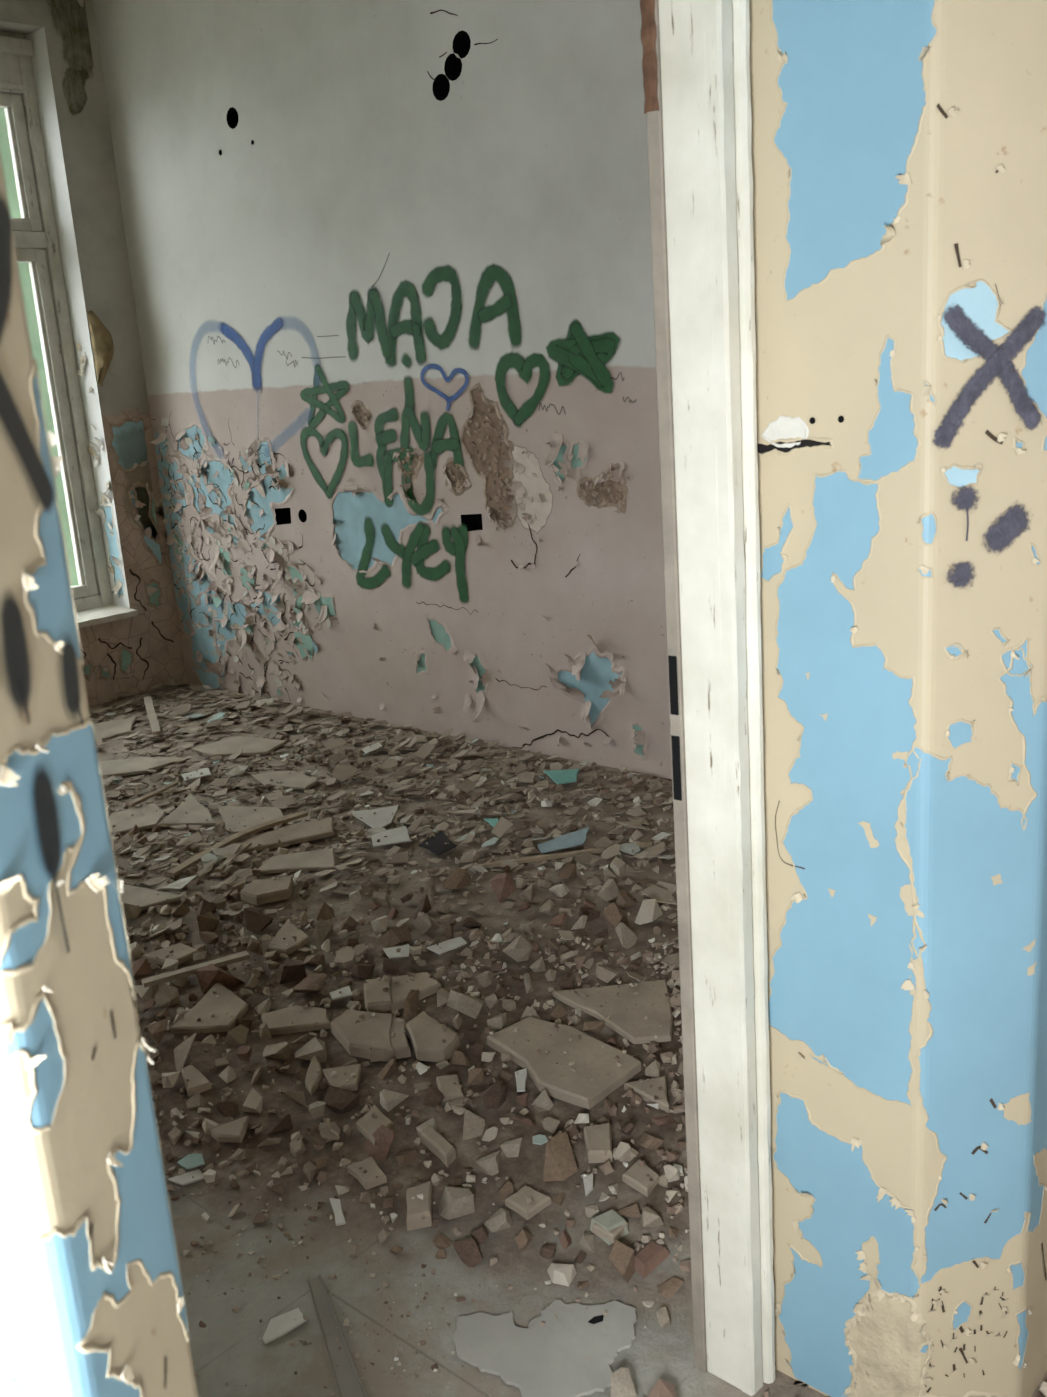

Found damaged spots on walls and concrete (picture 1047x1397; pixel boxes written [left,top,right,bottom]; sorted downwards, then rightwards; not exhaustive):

peeling [766,0,959,303]
peeling [21,357,135,682]
peeling [87,411,338,702]
peeling [330,383,629,577]
peeling [545,635,628,748]
peeling [937,243,1012,364]
peeling [985,291,1047,455]
peeling [0,718,136,1002]
peeling [757,334,1047,1397]
peeling [0,983,66,1135]
peeling [0,1038,190,1397]